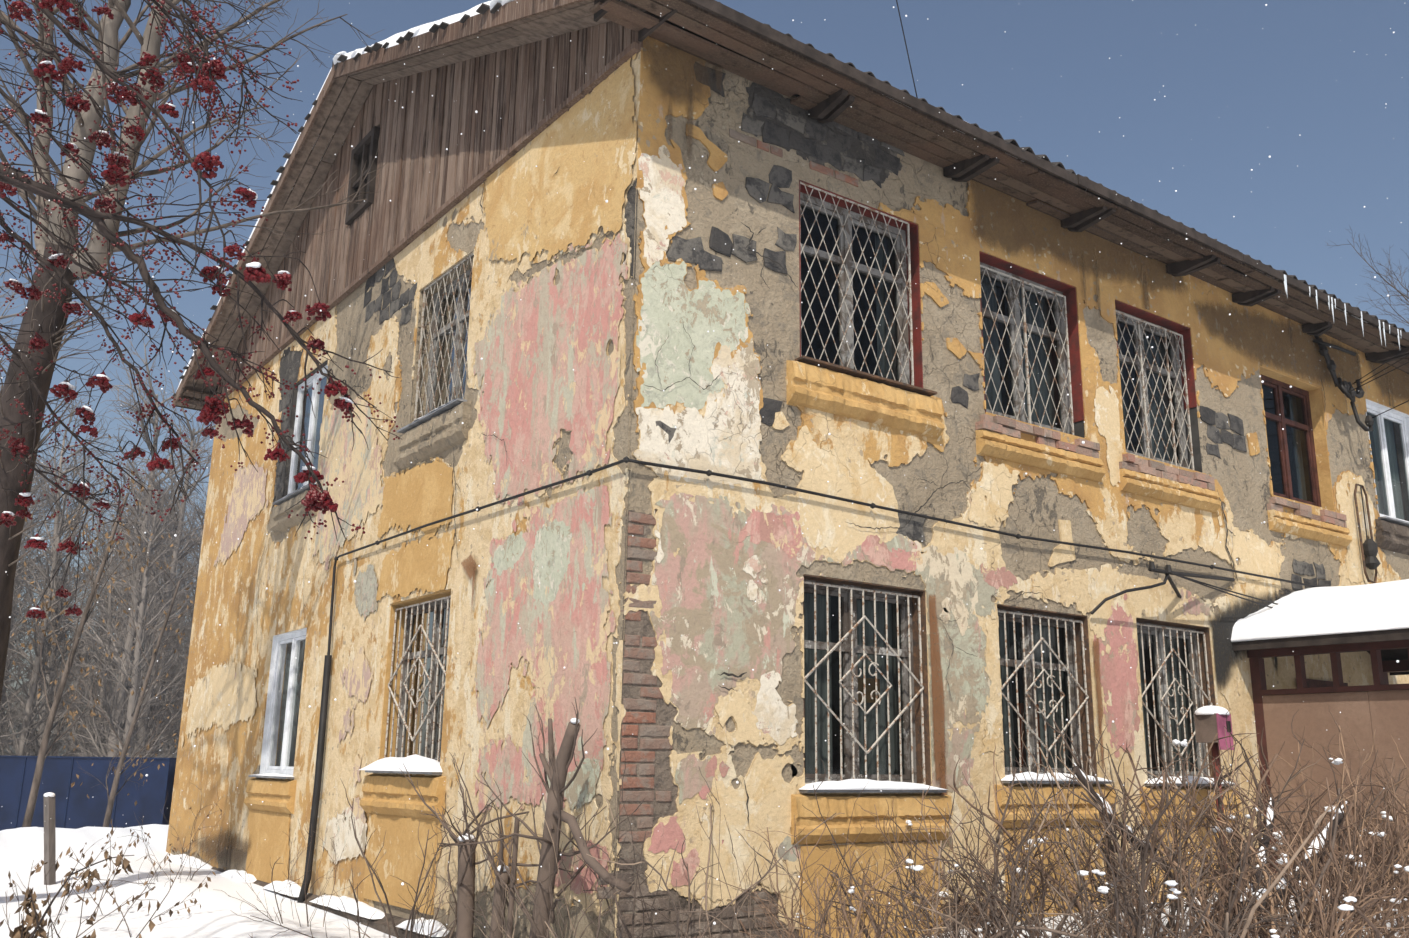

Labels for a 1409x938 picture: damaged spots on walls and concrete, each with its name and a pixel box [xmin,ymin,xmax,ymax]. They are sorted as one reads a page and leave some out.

flaking render [213,54,1409,938]
peeling [181,660,265,747]
flaking render [171,846,247,871]